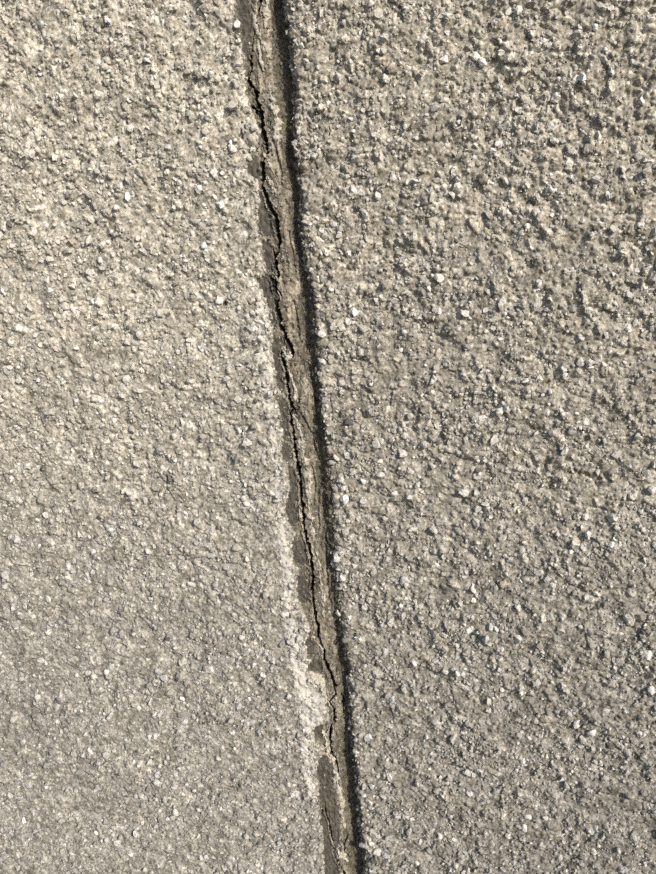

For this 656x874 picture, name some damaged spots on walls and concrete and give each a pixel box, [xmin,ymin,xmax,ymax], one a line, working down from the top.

crack [247,34,345,771]